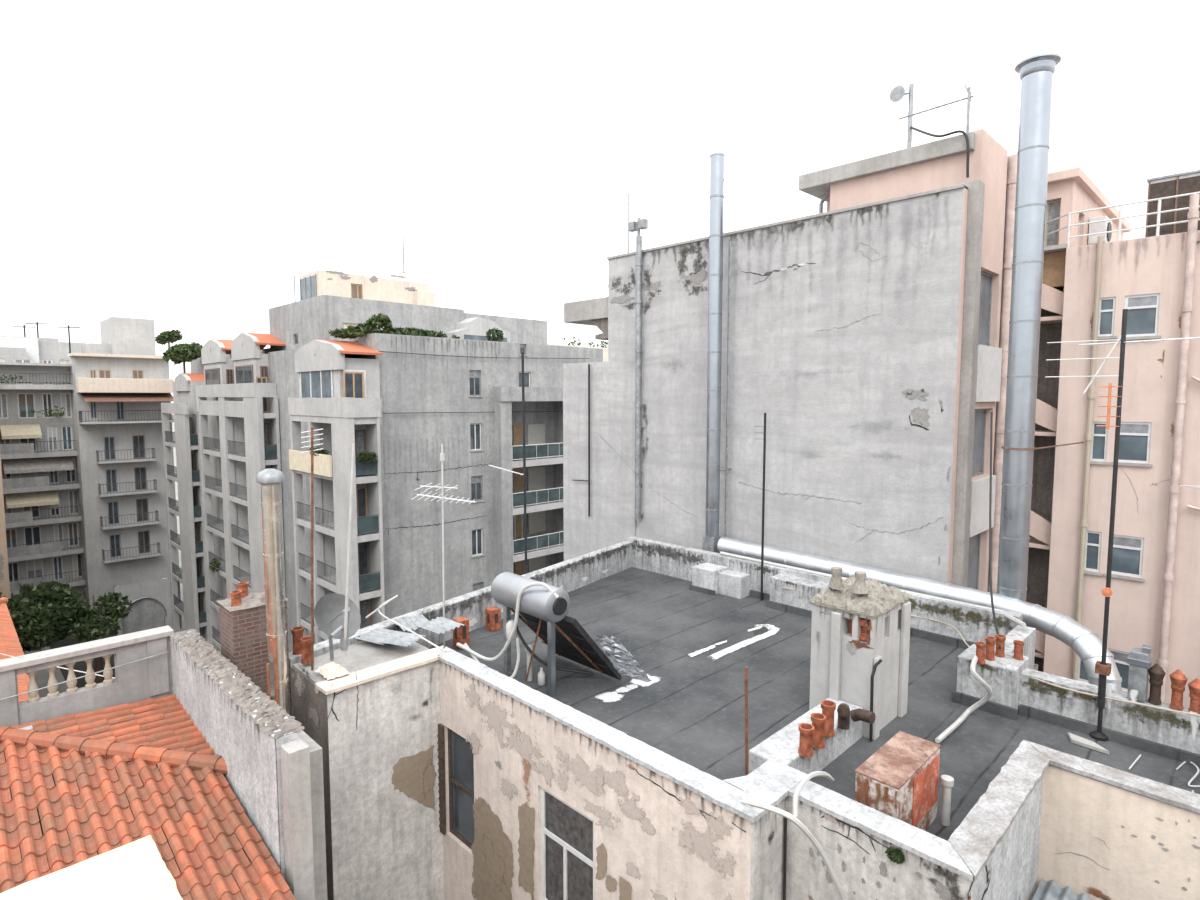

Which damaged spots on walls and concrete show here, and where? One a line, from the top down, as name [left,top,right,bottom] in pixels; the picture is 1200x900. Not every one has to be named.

water stain [731,215,832,238]
crack [741,263,816,284]
flaking render [902,389,944,430]
water stain [1095,684,1112,709]
water stain [1127,689,1198,741]
peeling [464,683,656,835]
rust [856,775,897,808]
peeling [672,797,735,878]
peeling [605,862,676,900]
peeling [809,844,845,883]
flaking render [853,862,896,895]
crack [967,865,993,900]